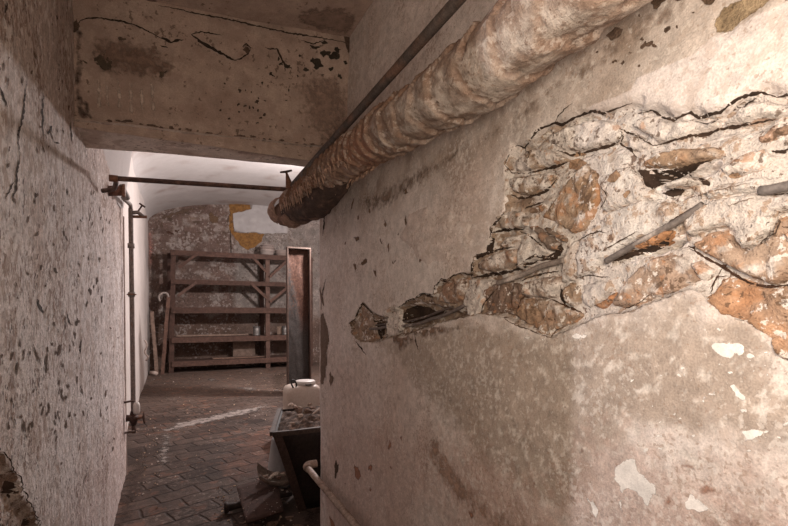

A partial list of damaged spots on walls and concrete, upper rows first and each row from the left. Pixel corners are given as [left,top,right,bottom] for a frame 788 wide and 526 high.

crack [73,5,350,71]
peeling [606,27,623,40]
peeling [715,0,769,32]
flaking render [186,204,265,250]
flaking render [349,93,788,360]
peeling [1,317,81,376]
peeling [40,402,85,441]
peeling [742,429,768,440]
spalling [0,452,38,526]